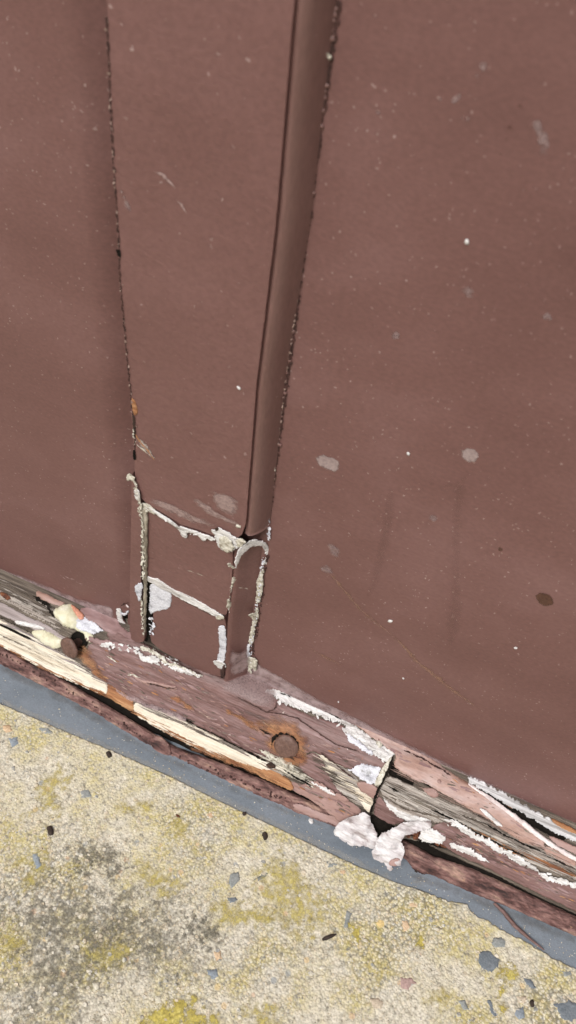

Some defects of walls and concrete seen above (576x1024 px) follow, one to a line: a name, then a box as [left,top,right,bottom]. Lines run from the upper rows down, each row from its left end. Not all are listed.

peeling [36,473,294,770]
crack [121,576,224,620]
rust [226,710,307,766]
crack [142,697,394,816]
peeling [269,689,576,902]